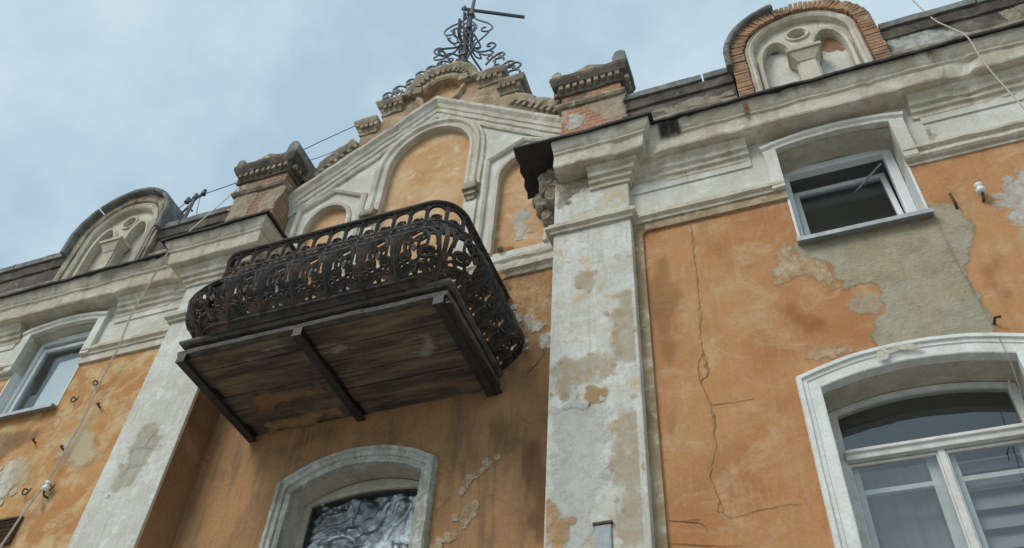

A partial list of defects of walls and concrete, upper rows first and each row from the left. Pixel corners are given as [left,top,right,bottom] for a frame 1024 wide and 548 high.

peeling [566,92,627,130]
spalling [501,169,589,253]
peeling [992,171,1024,227]
peeling [497,270,552,353]
peeling [550,290,635,409]
crack [668,222,797,547]
spalling [772,203,995,361]
peeling [0,457,22,505]
peeling [106,424,162,498]
peeling [430,454,500,548]